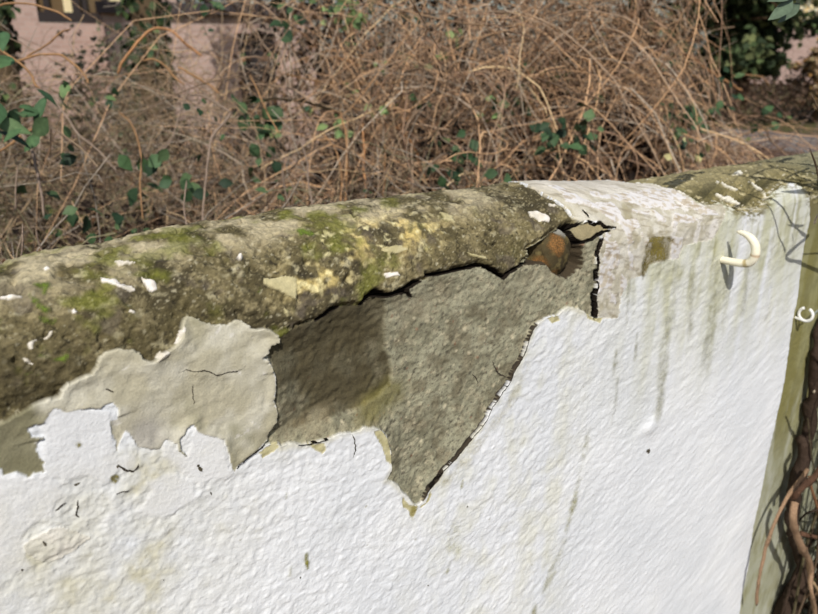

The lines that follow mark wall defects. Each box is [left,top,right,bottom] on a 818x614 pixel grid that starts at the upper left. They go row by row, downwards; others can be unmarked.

spalling [0,180,740,517]
crack [315,262,522,321]
crack [425,326,537,499]
crack [558,210,616,318]